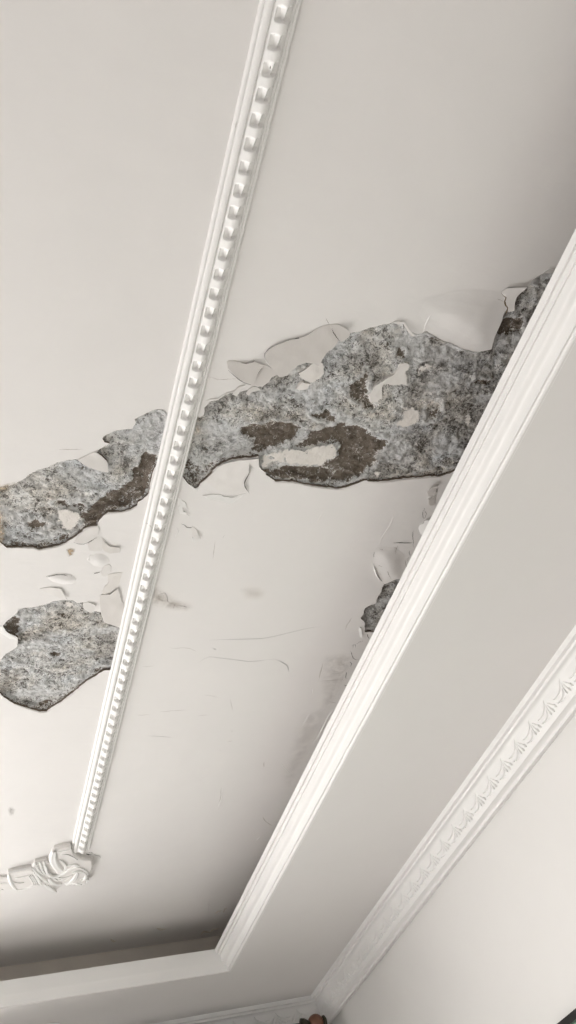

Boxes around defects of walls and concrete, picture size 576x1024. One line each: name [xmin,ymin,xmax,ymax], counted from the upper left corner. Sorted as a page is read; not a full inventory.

flaking render [183,269,555,506]
flaking render [0,409,167,551]
flaking render [0,572,124,713]
flaking render [359,579,400,638]